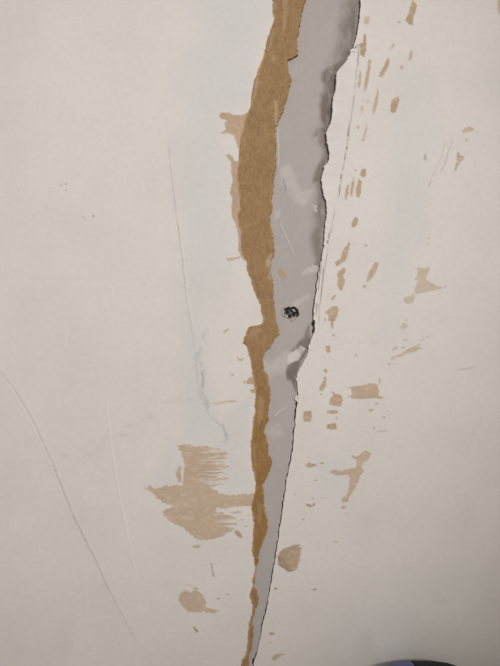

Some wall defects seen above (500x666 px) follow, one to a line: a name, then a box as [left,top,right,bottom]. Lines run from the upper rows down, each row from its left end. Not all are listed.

peeling [397,0,418,26]
peeling [403,266,447,305]
peeling [144,0,372,666]
peeling [319,368,385,431]